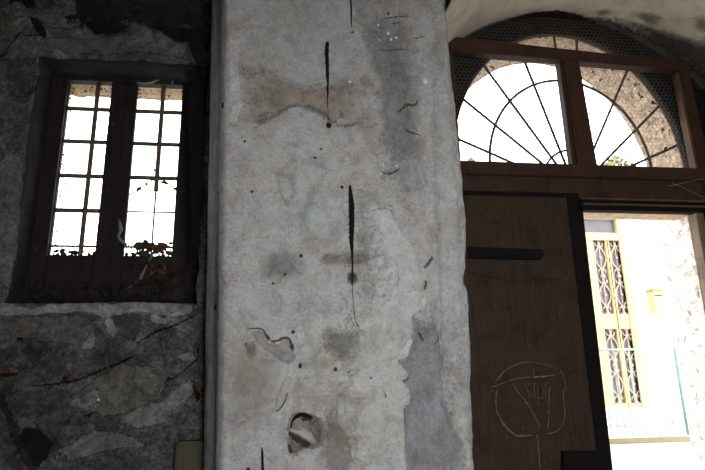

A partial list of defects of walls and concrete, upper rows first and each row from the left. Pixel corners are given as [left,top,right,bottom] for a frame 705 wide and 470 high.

crack [324,41,332,128]
crack [348,185,359,327]
crack [31,316,193,387]
crack [166,348,199,381]
peeling [249,327,302,369]
peeling [333,208,426,470]
spalling [287,408,337,453]